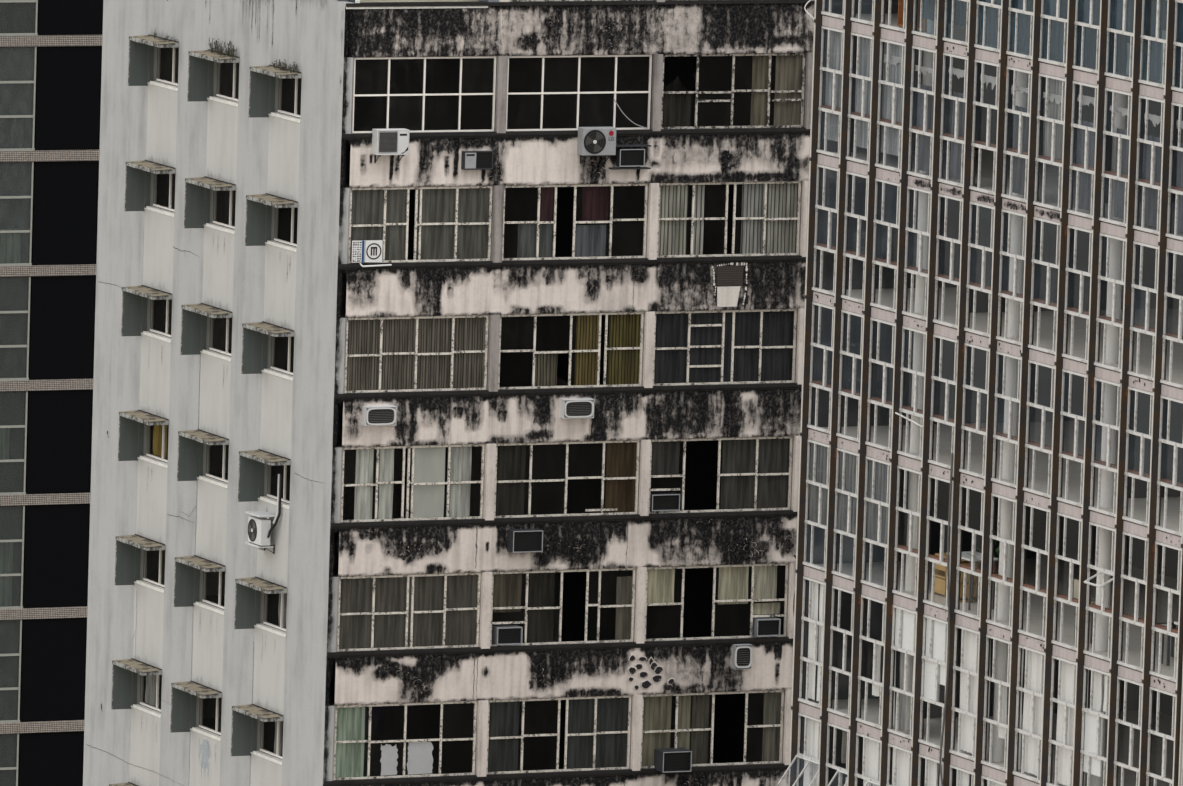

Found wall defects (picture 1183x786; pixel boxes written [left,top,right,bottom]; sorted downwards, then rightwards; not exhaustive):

leakage [339,3,815,227]
leakage [323,253,806,786]